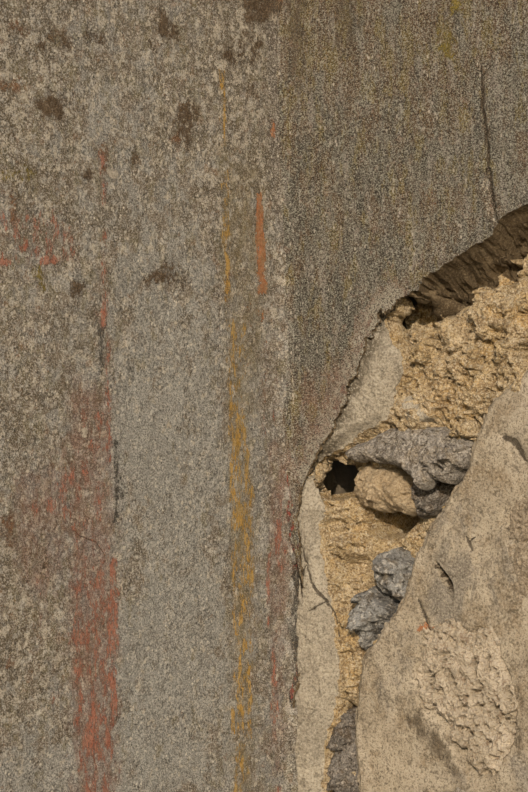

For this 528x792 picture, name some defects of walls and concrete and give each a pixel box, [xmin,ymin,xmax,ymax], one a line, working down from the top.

leakage [223,0,306,78]
crack [480,64,498,220]
flaking render [293,204,528,792]